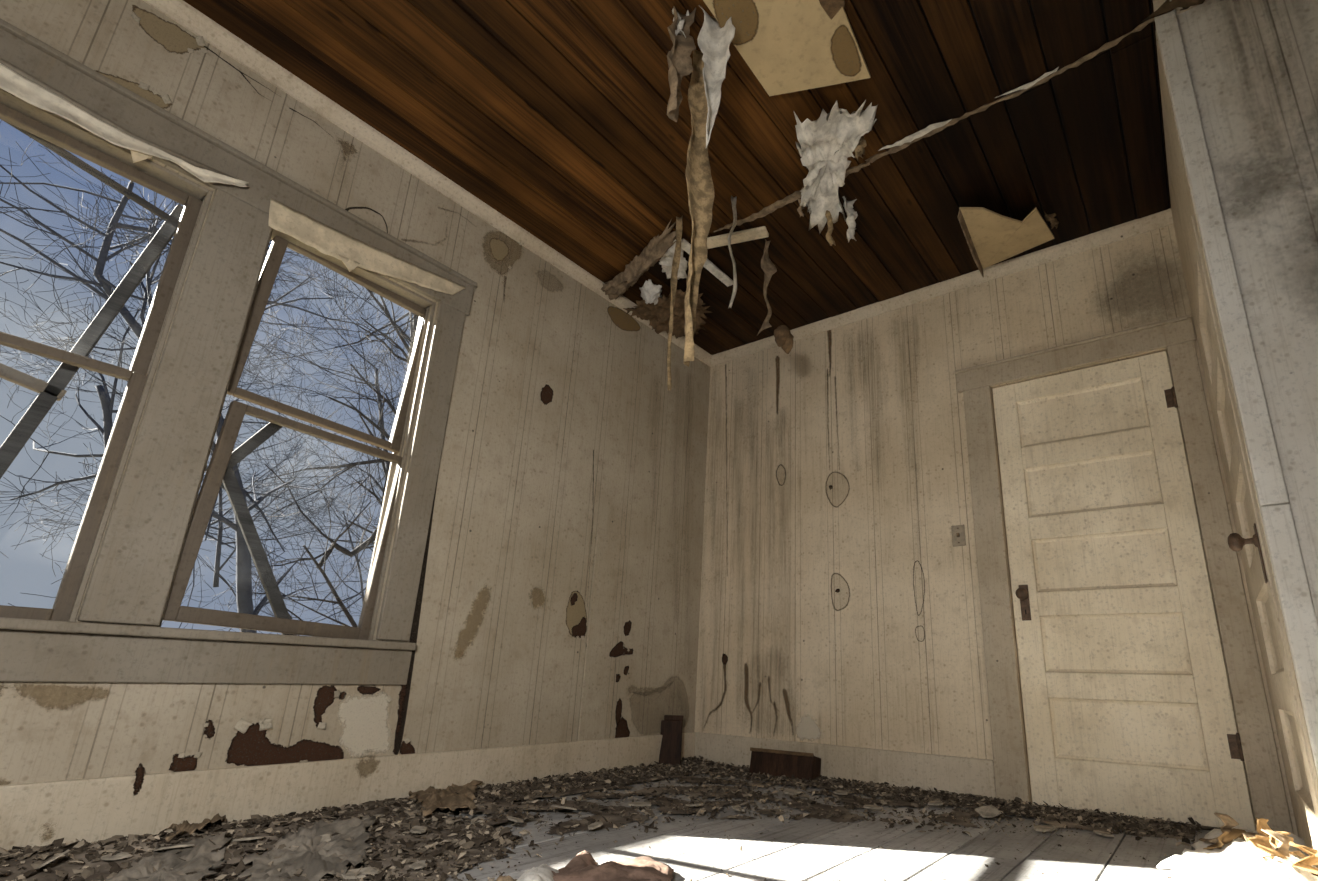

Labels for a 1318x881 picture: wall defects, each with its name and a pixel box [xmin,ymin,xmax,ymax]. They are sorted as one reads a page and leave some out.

peeling [131,5,208,54]
water stain [713,0,759,45]
water stain [831,25,862,77]
water stain [827,330,837,414]
peeling [566,590,587,639]
water stain [831,573,850,611]
water stain [913,561,925,642]
spalling [609,620,633,682]
spalling [168,720,215,772]
spalling [225,685,415,766]
spalling [615,698,630,738]